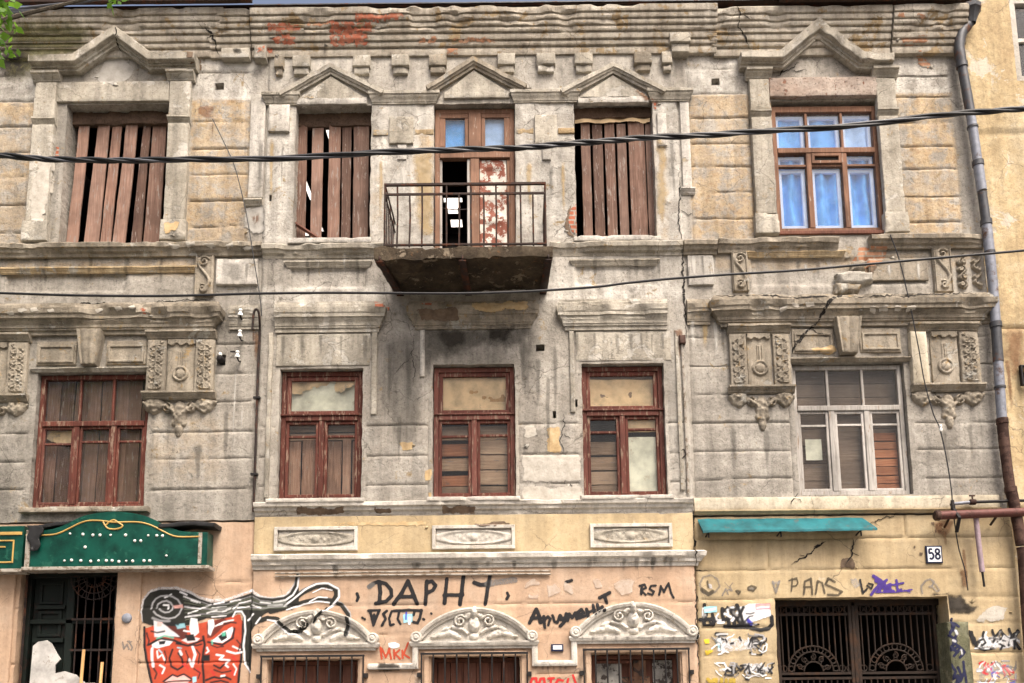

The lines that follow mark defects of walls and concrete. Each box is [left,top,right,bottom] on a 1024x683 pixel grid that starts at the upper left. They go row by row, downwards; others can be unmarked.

flaking render [258,13,404,57]
crack [737,6,750,46]
flaking render [564,205,577,237]
crack [678,176,692,339]
leakage [428,327,527,354]
crack [716,292,976,353]
flaking render [521,425,585,500]
peeling [296,506,433,529]
peeling [441,504,510,527]
crack [795,541,826,562]
crack [847,512,901,562]